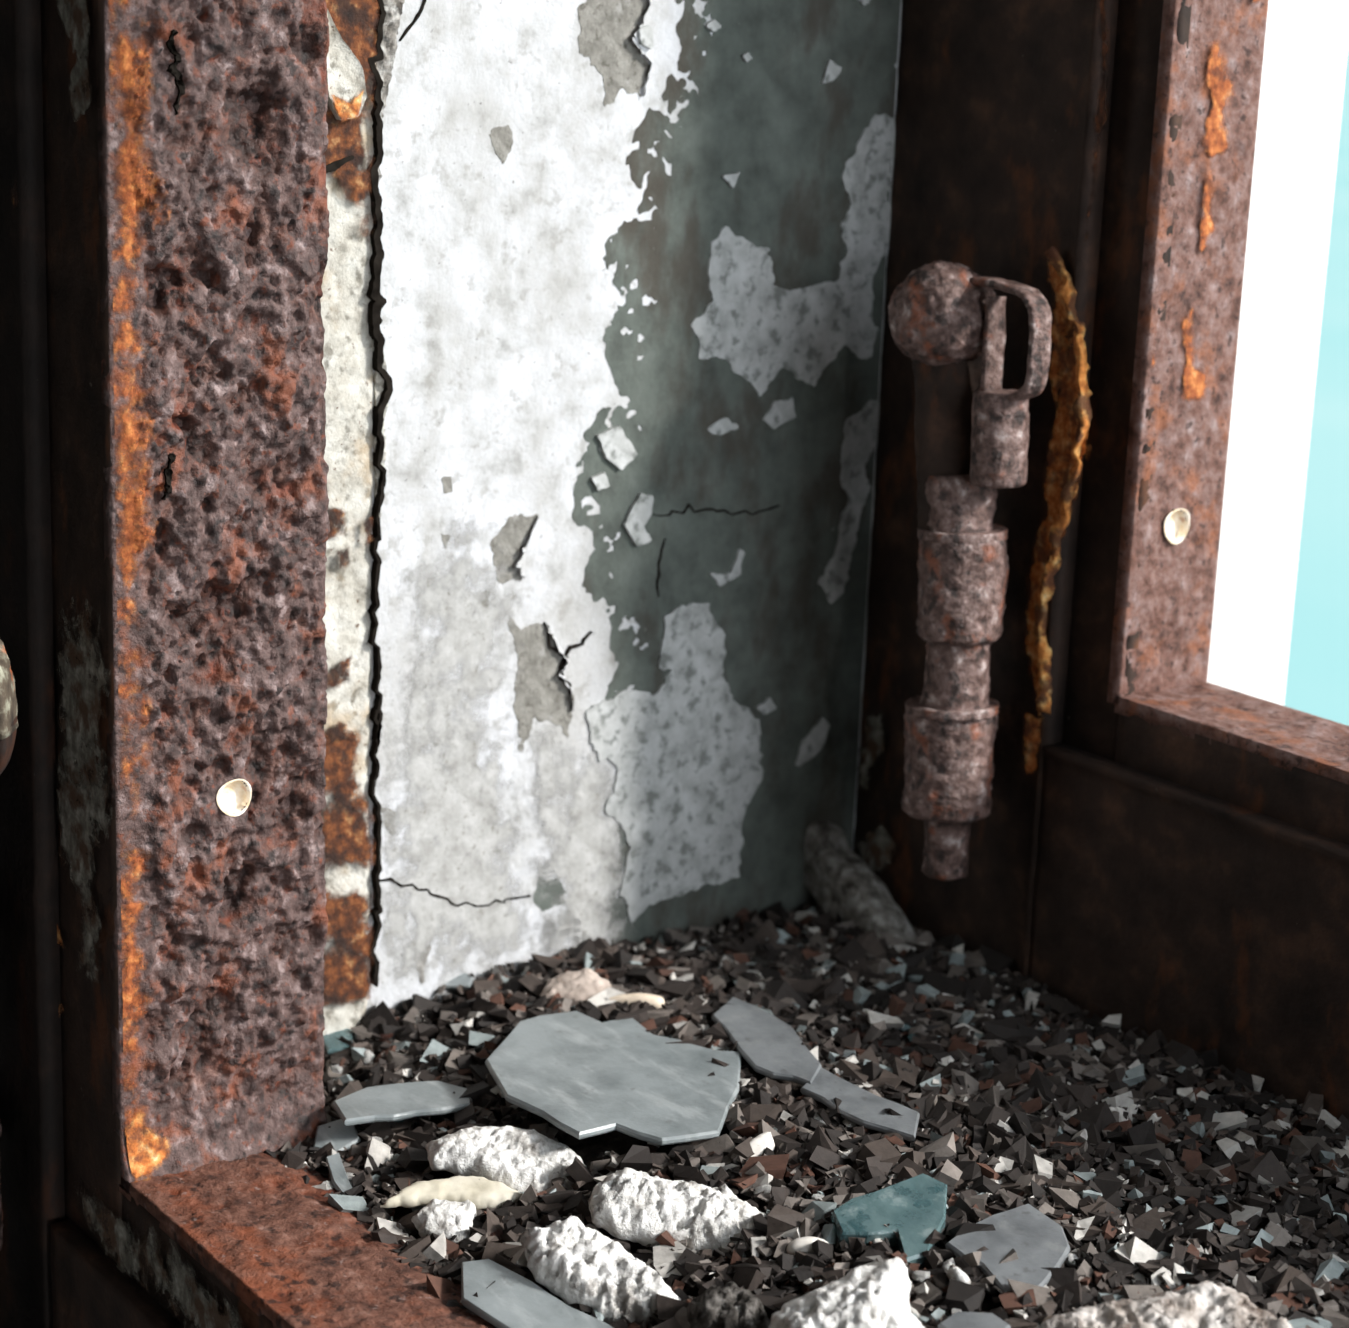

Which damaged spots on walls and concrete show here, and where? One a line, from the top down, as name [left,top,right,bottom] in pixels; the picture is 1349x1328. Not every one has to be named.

rust [325,0,379,236]
peeling [489,125,513,164]
rust [109,35,170,624]
rust [327,508,350,568]
crack [326,0,531,987]
peeling [484,514,539,597]
peeling [508,0,918,954]
rust [1023,246,1093,773]
rust [327,656,351,688]
rust [321,722,375,868]
rust [324,889,373,1006]
rust [125,1110,169,1178]